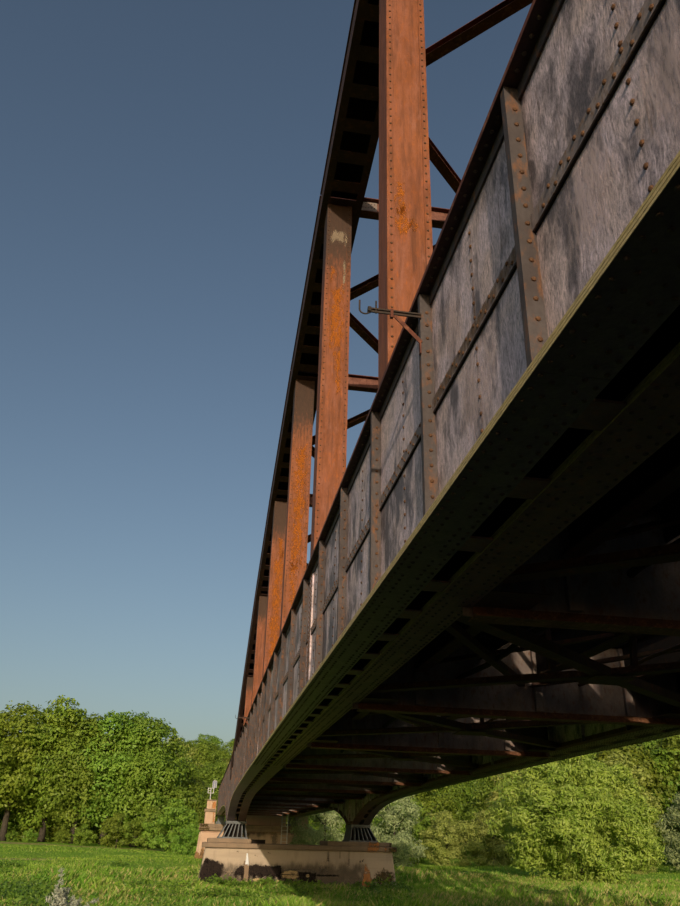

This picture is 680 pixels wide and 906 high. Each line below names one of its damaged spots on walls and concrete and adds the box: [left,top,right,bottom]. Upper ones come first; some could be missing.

corrosion [269,444,308,661]
damp [194,849,361,886]